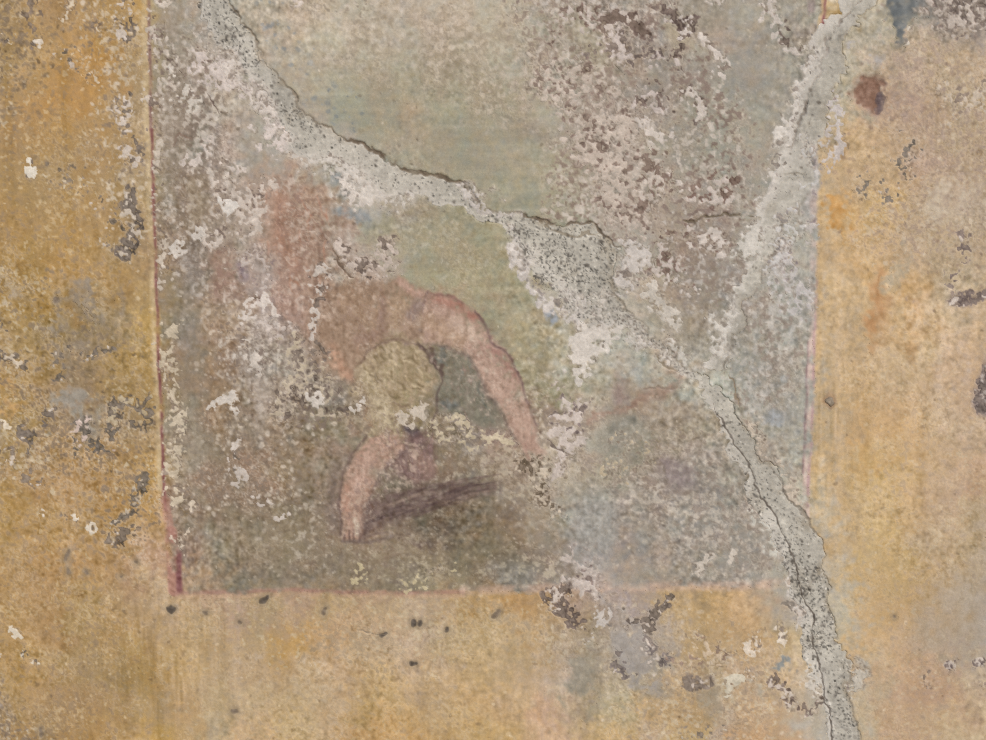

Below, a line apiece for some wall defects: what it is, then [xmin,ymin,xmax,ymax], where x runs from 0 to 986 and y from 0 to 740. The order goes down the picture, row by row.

peeling [0,0,430,432]
crack [197,0,621,295]
peeling [392,0,897,537]
crack [790,0,877,175]
flaking render [901,0,986,60]
flaking render [926,67,986,132]
flaking render [940,226,986,312]
peeling [0,313,245,569]
crack [545,411,572,456]
crack [643,211,861,740]
flaking render [969,355,986,426]
flaking render [538,504,824,723]